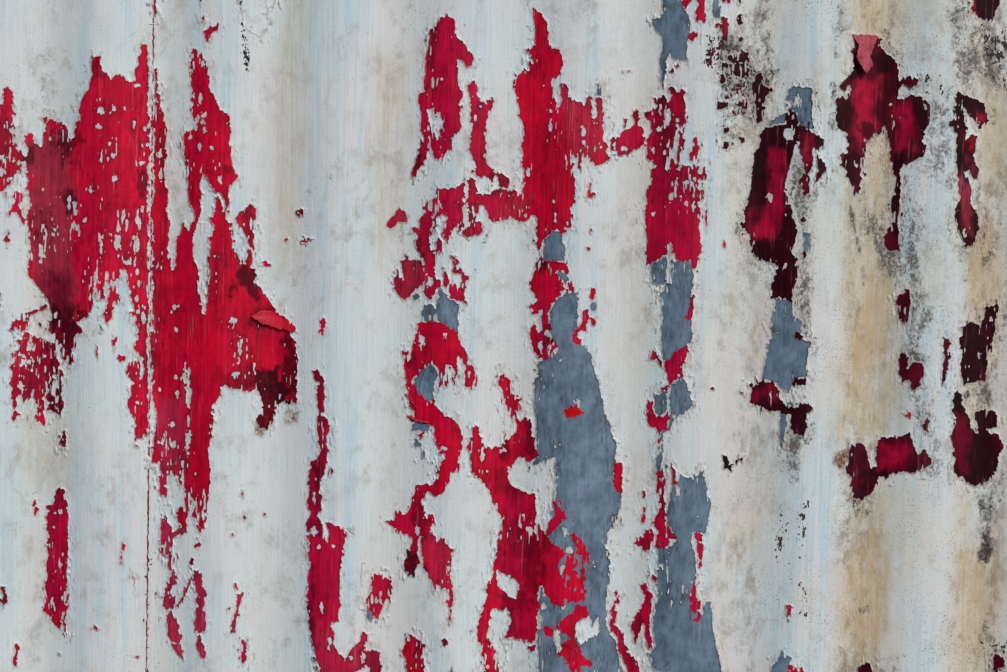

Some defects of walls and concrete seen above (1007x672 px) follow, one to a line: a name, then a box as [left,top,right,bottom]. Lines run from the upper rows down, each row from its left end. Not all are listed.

peeling [146,0,164,24]
peeling [232,0,286,44]
peeling [961,0,1001,30]
peeling [282,234,315,247]
peeling [945,83,996,254]
peeling [0,11,307,672]
peeling [299,0,938,672]
peeling [839,297,1007,507]